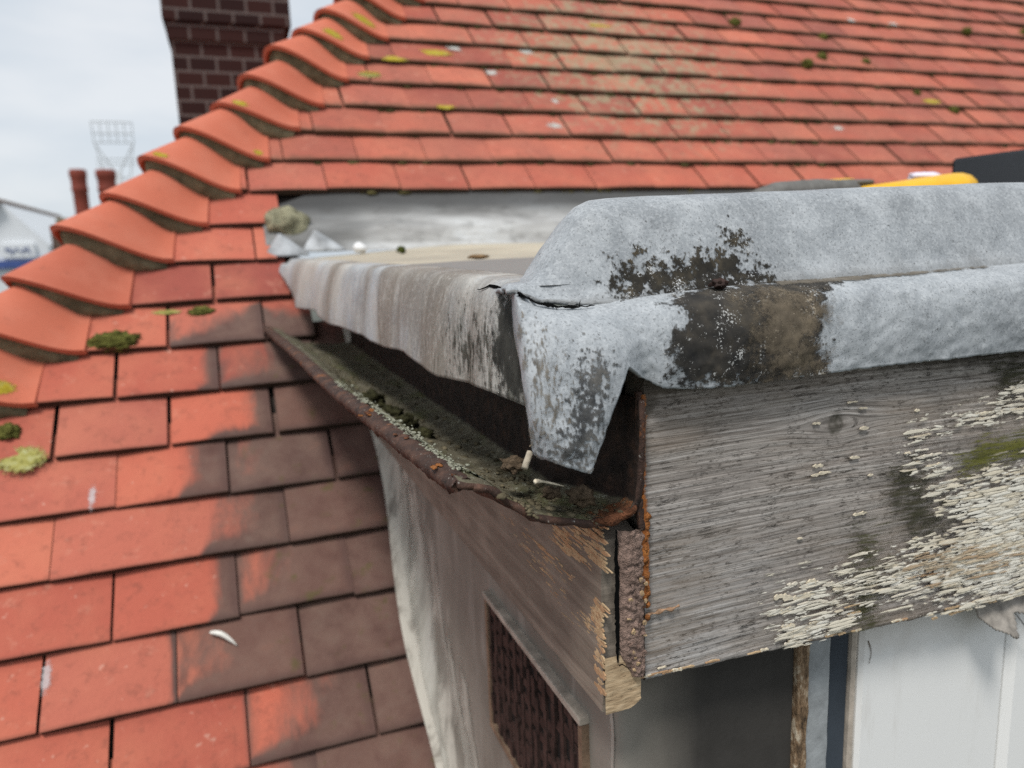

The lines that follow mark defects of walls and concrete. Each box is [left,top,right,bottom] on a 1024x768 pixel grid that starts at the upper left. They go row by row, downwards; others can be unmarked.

leakage [442,293,628,473]
crack [477,284,595,309]
leakage [594,215,987,390]
peeling [473,483,720,696]
rust [588,455,680,621]
peeling [747,381,1024,655]